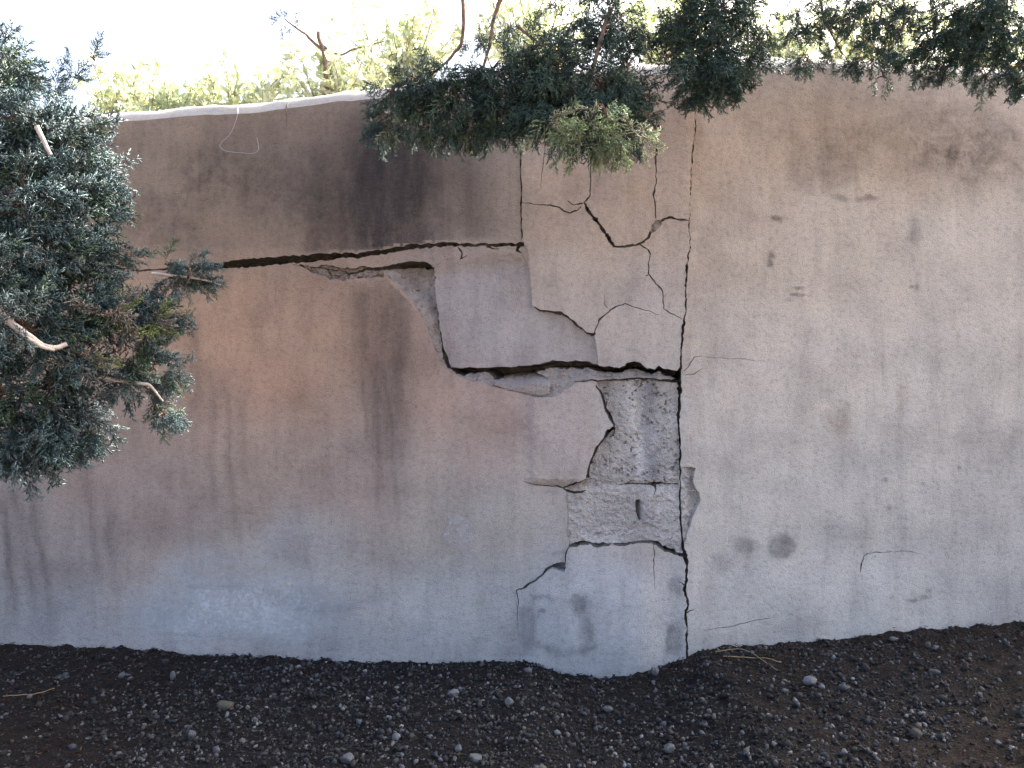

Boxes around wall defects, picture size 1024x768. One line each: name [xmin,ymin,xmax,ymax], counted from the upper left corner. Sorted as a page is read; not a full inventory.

crack [134,265,185,273]
crack [210,106,770,656]
peeling [290,251,701,551]